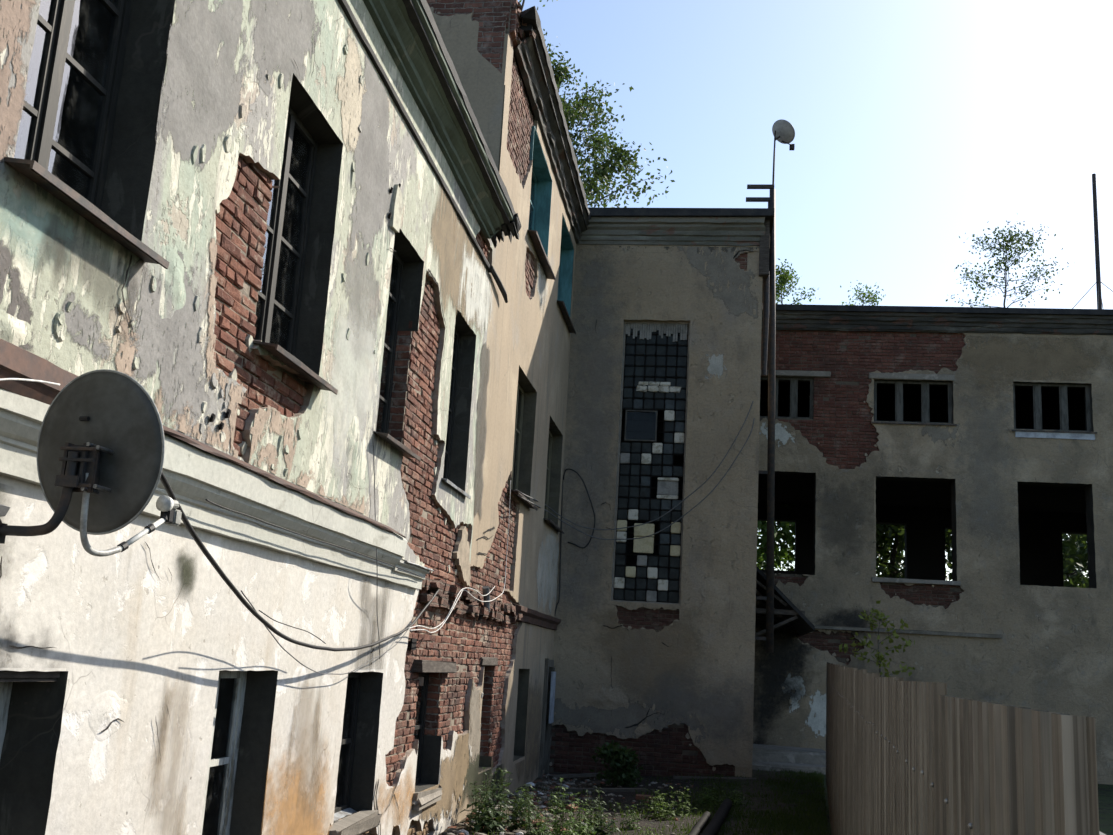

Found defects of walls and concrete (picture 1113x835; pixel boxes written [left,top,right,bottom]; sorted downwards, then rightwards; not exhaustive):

peeling [0,0,37,161]
spalling [466,0,534,184]
spalling [54,0,365,514]
peeling [334,28,402,361]
spalling [735,253,747,271]
spalling [759,330,965,469]
spalling [385,277,519,835]
spalling [616,605,680,633]
spalling [549,723,735,777]
peeling [782,673,826,738]